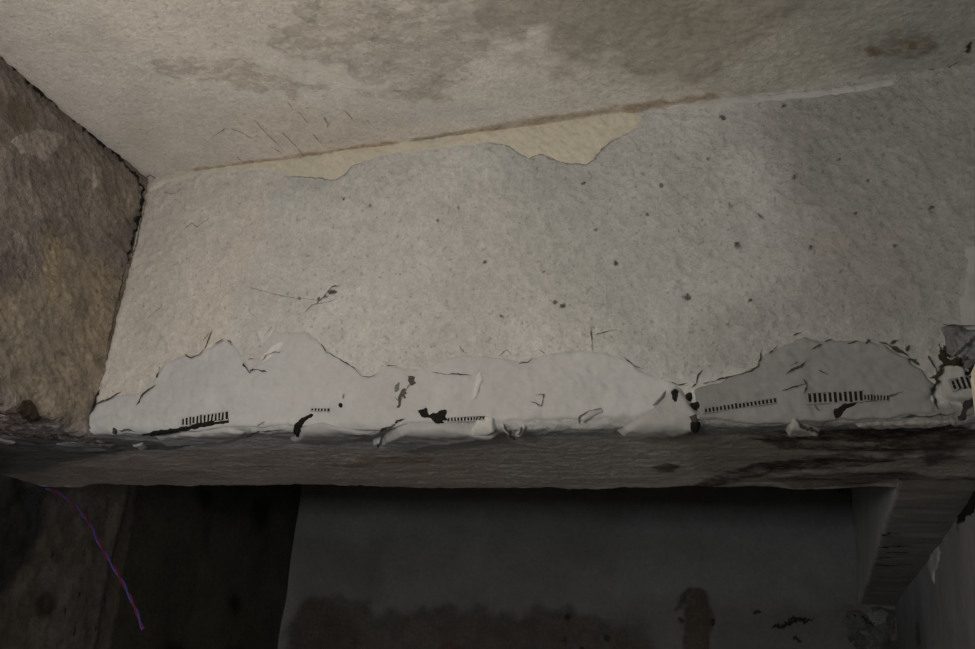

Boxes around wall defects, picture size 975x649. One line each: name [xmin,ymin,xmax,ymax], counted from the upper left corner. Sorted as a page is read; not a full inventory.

peeling [147,112,643,193]
spalling [938,324,975,389]
peeling [155,428,245,446]
peeling [471,416,497,436]
water stain [695,425,975,490]
spalling [855,406,975,430]